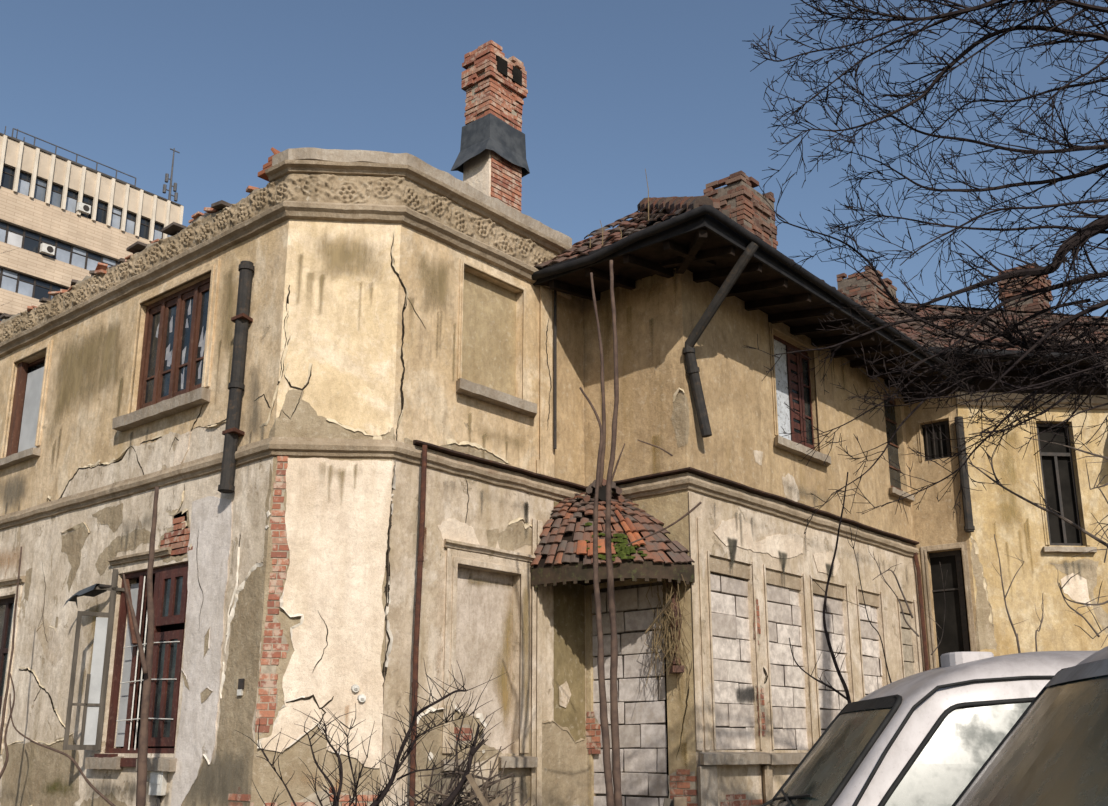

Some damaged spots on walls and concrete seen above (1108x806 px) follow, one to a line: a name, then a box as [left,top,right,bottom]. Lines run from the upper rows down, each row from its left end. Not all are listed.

water stain [320,241,370,299]
water stain [55,325,123,421]
crack [254,285,312,427]
water stain [5,479,24,514]
crack [45,404,226,502]
flaking render [268,389,509,464]
crack [381,230,425,684]
crack [19,667,65,729]
peeling [61,456,393,806]
crack [285,611,334,726]
peeling [559,681,571,708]
flaking render [524,711,601,806]